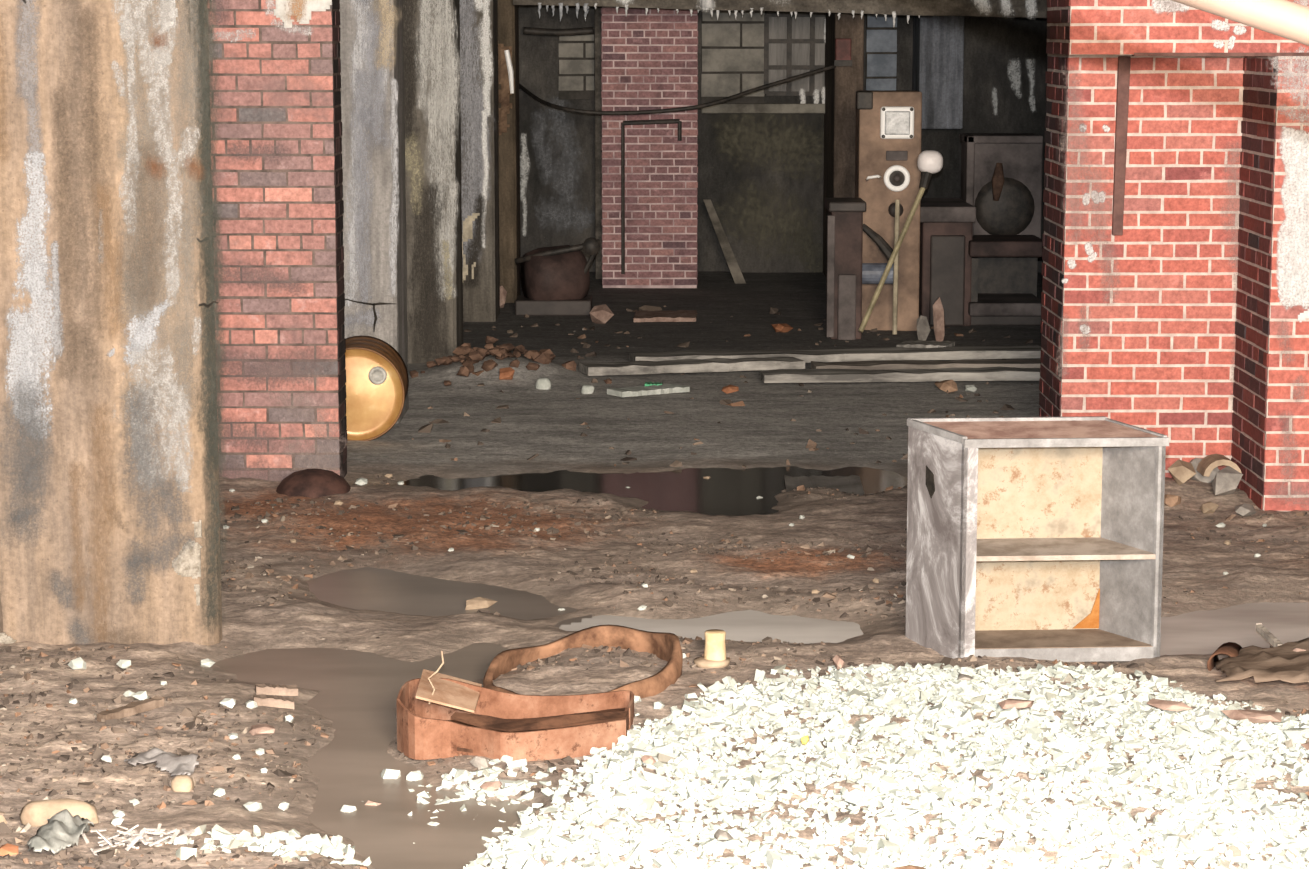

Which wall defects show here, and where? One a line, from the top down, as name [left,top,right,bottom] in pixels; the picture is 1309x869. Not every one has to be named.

peeling [274,0,332,28]
damp [538,3,597,21]
damp [676,0,920,42]
damp [800,87,825,104]
damp [344,0,493,361]
damp [520,98,594,235]
damp [5,0,64,535]
damp [108,0,332,625]